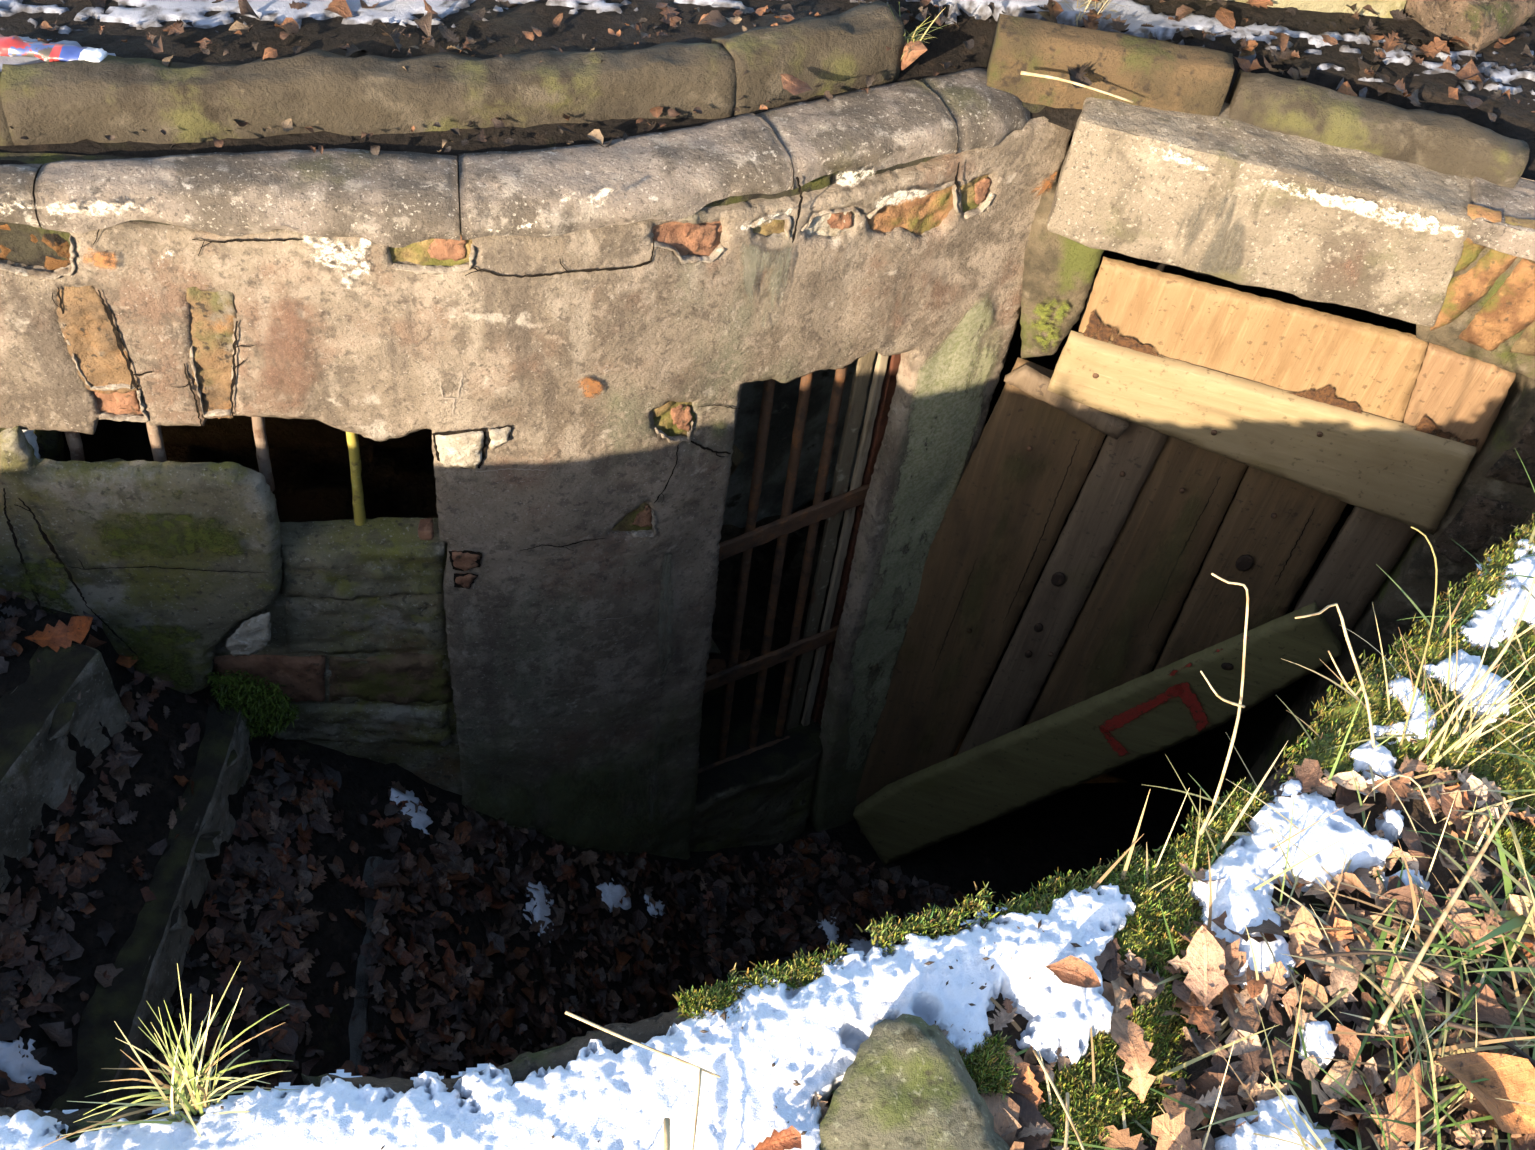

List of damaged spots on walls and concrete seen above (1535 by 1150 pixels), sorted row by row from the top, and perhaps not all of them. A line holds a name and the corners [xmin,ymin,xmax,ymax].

spalling [750,175,995,239]
crack [192,238,304,256]
spalling [389,232,476,275]
crack [465,238,654,278]
spalling [651,221,725,264]
crack [52,287,66,326]
crack [98,290,255,426]
spalling [651,401,696,443]
spalling [432,426,512,469]
crack [3,488,266,661]